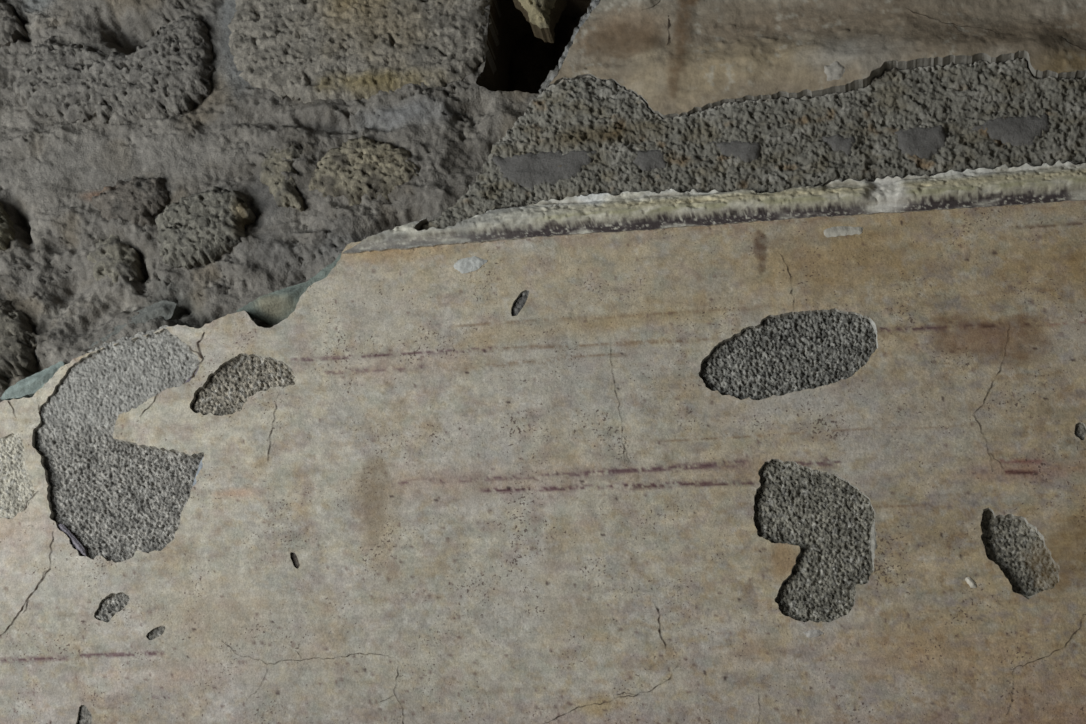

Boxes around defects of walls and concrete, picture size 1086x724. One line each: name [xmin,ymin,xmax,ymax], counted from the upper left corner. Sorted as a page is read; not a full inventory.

flaking render [0,0,1086,562]
crack [4,531,53,633]
spalling [95,593,130,623]
spalling [754,460,878,638]
spalling [980,510,1059,599]